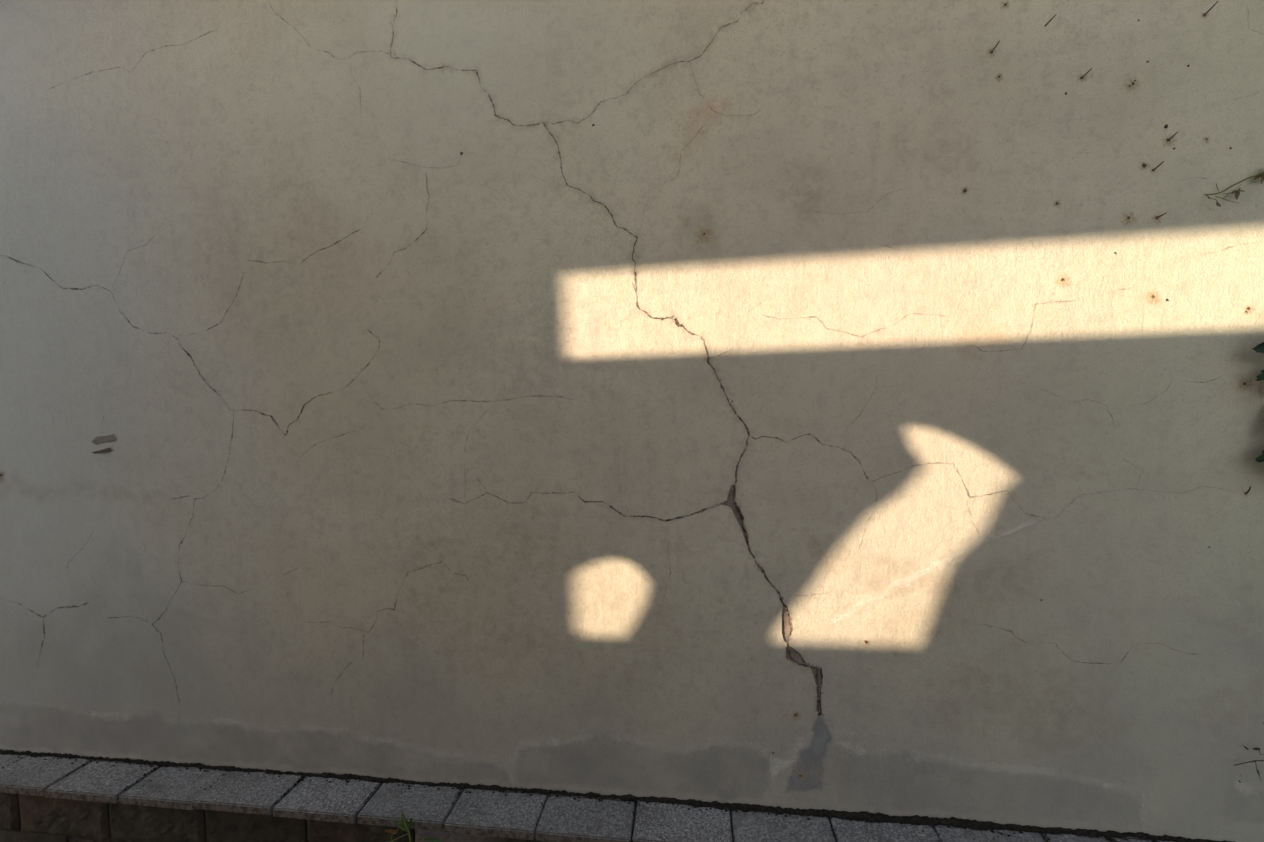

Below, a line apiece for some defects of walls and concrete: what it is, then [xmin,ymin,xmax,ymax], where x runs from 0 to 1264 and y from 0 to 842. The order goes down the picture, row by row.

crack [231,394,325,438]
crack [543,102,823,716]
damp [787,718,831,791]